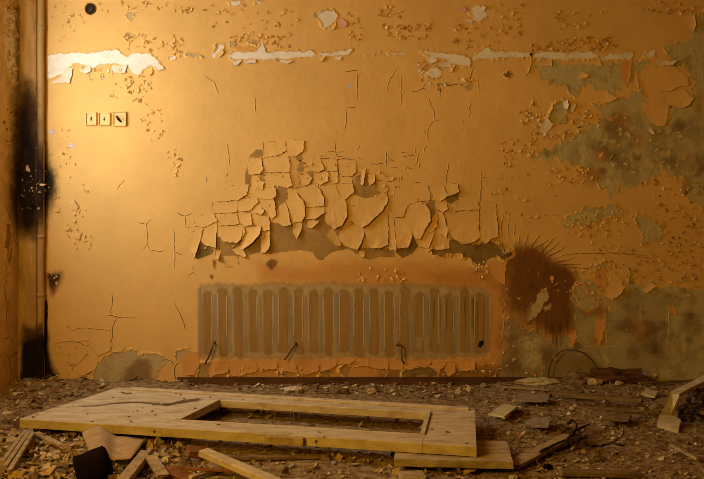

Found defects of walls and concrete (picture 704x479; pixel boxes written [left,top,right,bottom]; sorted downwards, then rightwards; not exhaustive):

crack [386,66,479,140]
peeling [45,0,704,382]
crack [138,212,196,276]
crack [47,292,135,375]
crack [173,302,186,332]
leakage [198,282,491,359]
rust [507,234,582,333]